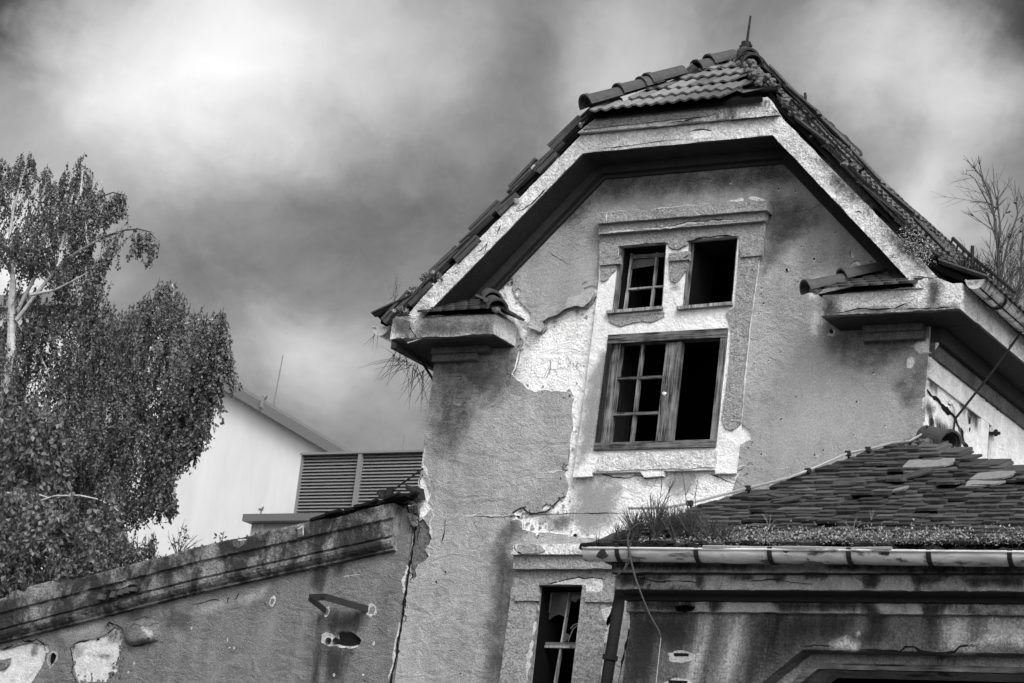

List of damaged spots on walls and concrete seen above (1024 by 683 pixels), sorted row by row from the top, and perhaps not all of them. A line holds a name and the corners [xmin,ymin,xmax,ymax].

peeling [496,280,763,538]
water stain [313,565,343,591]
crack [388,503,630,683]
water stain [318,613,363,631]
peeling [0,643,47,683]
peeling [72,629,135,683]